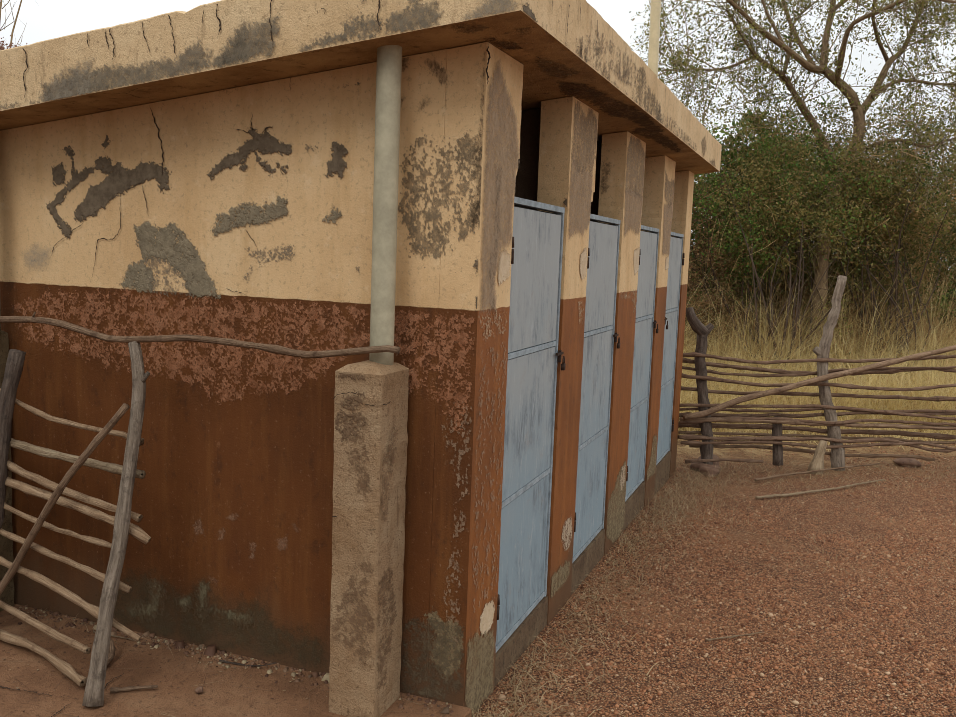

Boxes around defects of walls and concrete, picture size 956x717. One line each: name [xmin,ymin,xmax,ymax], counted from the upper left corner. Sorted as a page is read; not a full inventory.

crack [87,28,115,59]
damp [300,0,444,52]
crack [484,43,492,84]
damp [578,32,715,165]
crack [52,86,164,277]
peeling [46,135,172,239]
peeling [210,194,288,236]
peeling [207,127,292,180]
damp [398,62,519,311]
peeling [11,221,370,405]
peeling [394,297,507,612]
crack [0,686,69,717]